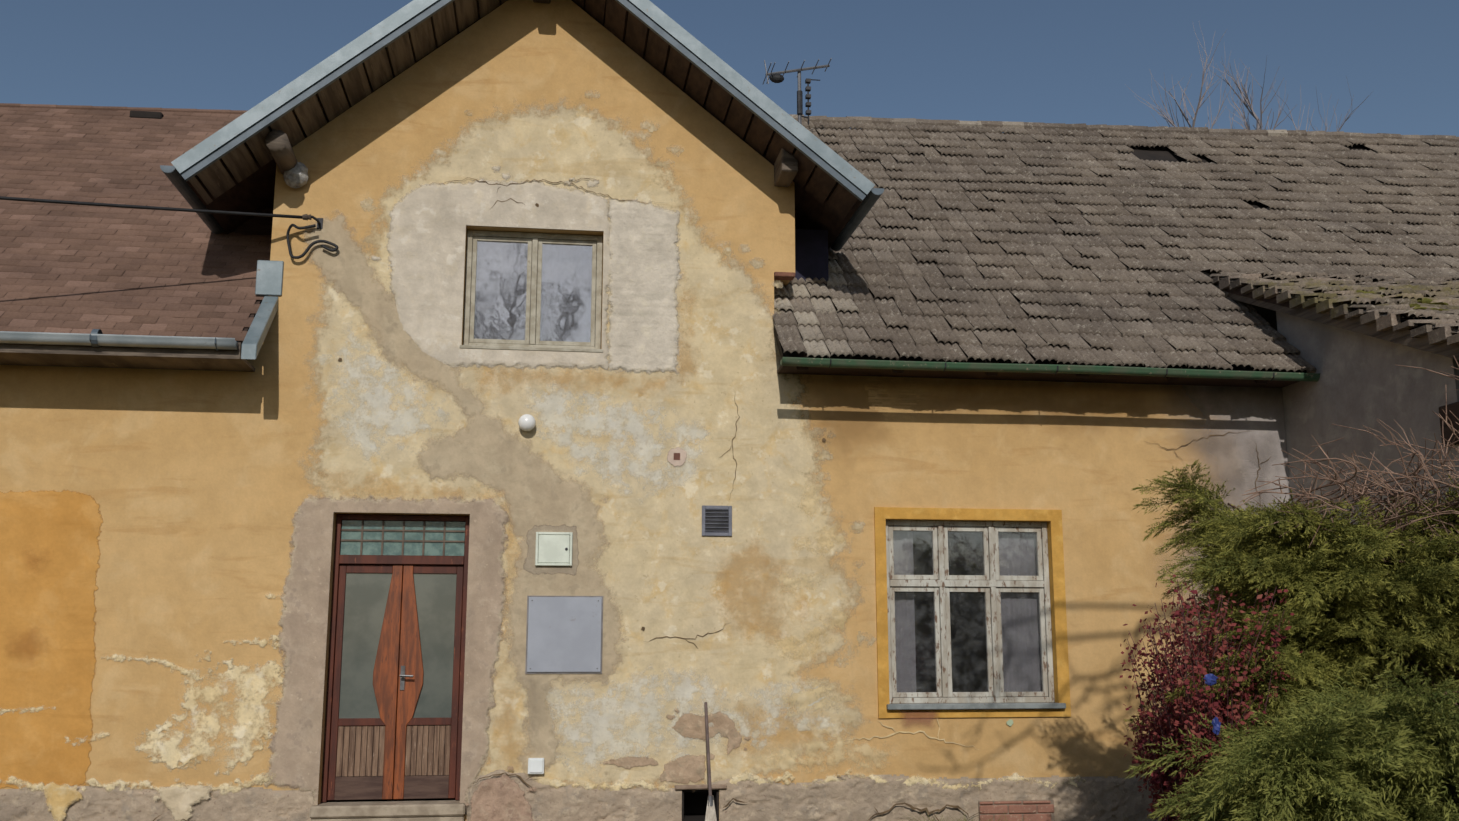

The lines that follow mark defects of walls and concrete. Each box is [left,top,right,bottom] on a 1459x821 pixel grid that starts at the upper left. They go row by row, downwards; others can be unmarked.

peeling [304,92,1086,821]
crack [721,398,740,500]
peeling [0,776,48,792]
peeling [67,635,285,800]